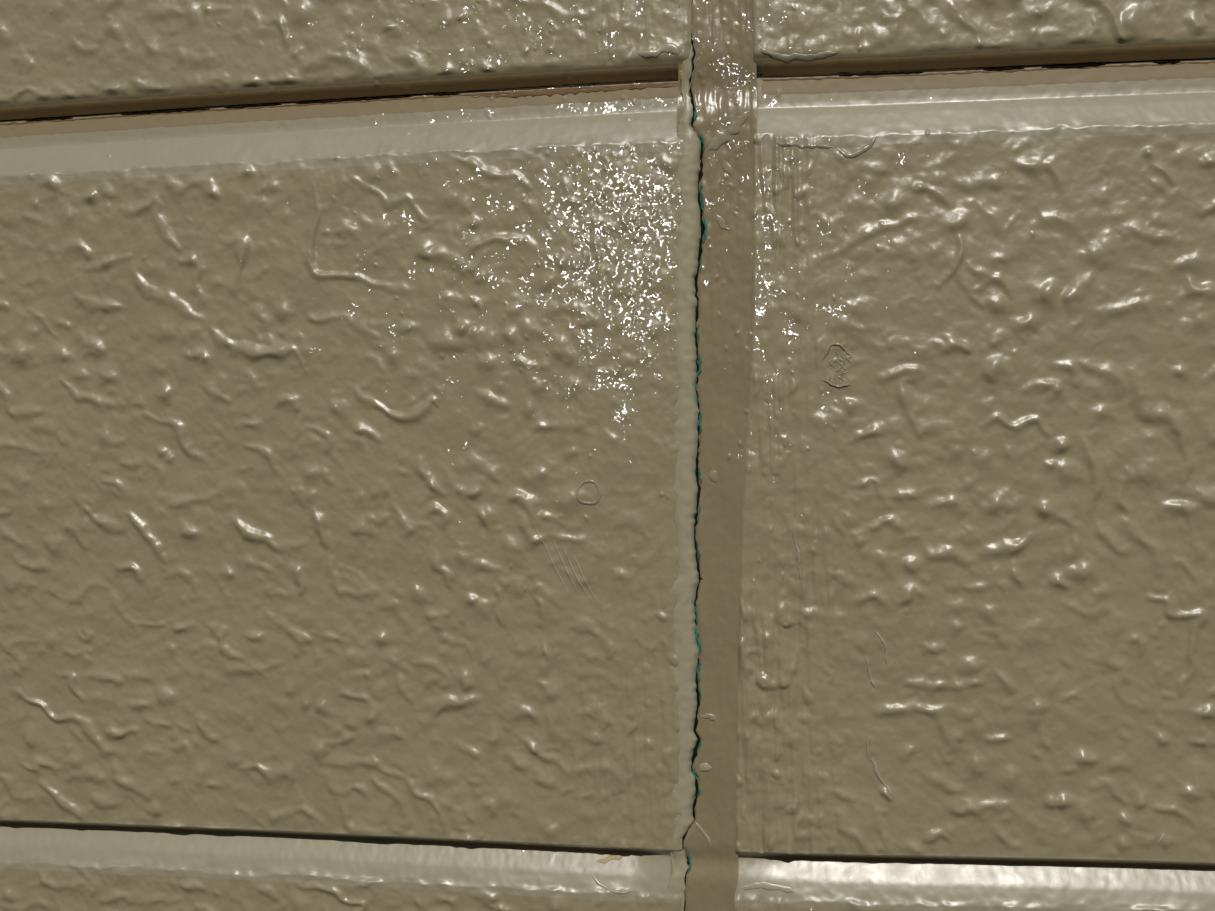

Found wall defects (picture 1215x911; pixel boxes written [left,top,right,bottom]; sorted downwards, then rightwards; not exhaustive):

crack [683,37,705,911]